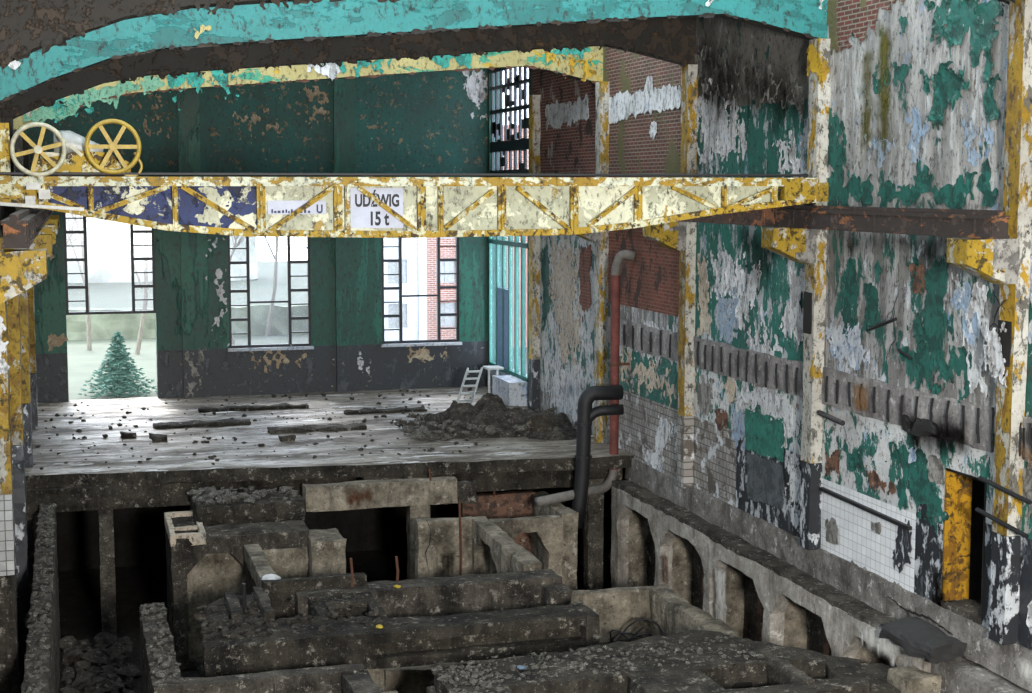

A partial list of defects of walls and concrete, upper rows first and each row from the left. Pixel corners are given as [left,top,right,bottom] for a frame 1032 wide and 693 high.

peeling [23,47,512,139]
peeling [516,43,604,131]
damp [703,59,739,110]
damp [751,78,796,119]
peeling [681,0,907,178]
peeling [827,0,1015,209]
peeling [0,316,10,374]
peeling [696,241,805,509]
peeling [825,253,1008,588]
spalling [56,510,100,571]
spalling [113,505,190,567]
spalling [304,506,408,552]